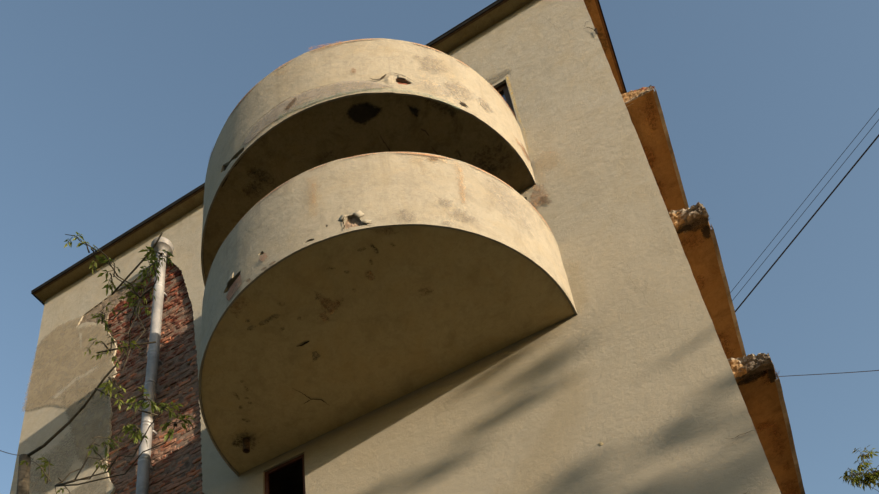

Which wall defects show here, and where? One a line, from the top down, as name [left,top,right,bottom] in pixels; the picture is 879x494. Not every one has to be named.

peeling [222,75,408,186]
spalling [667,202,711,239]
flaking render [78,261,204,494]
spalling [727,353,778,385]